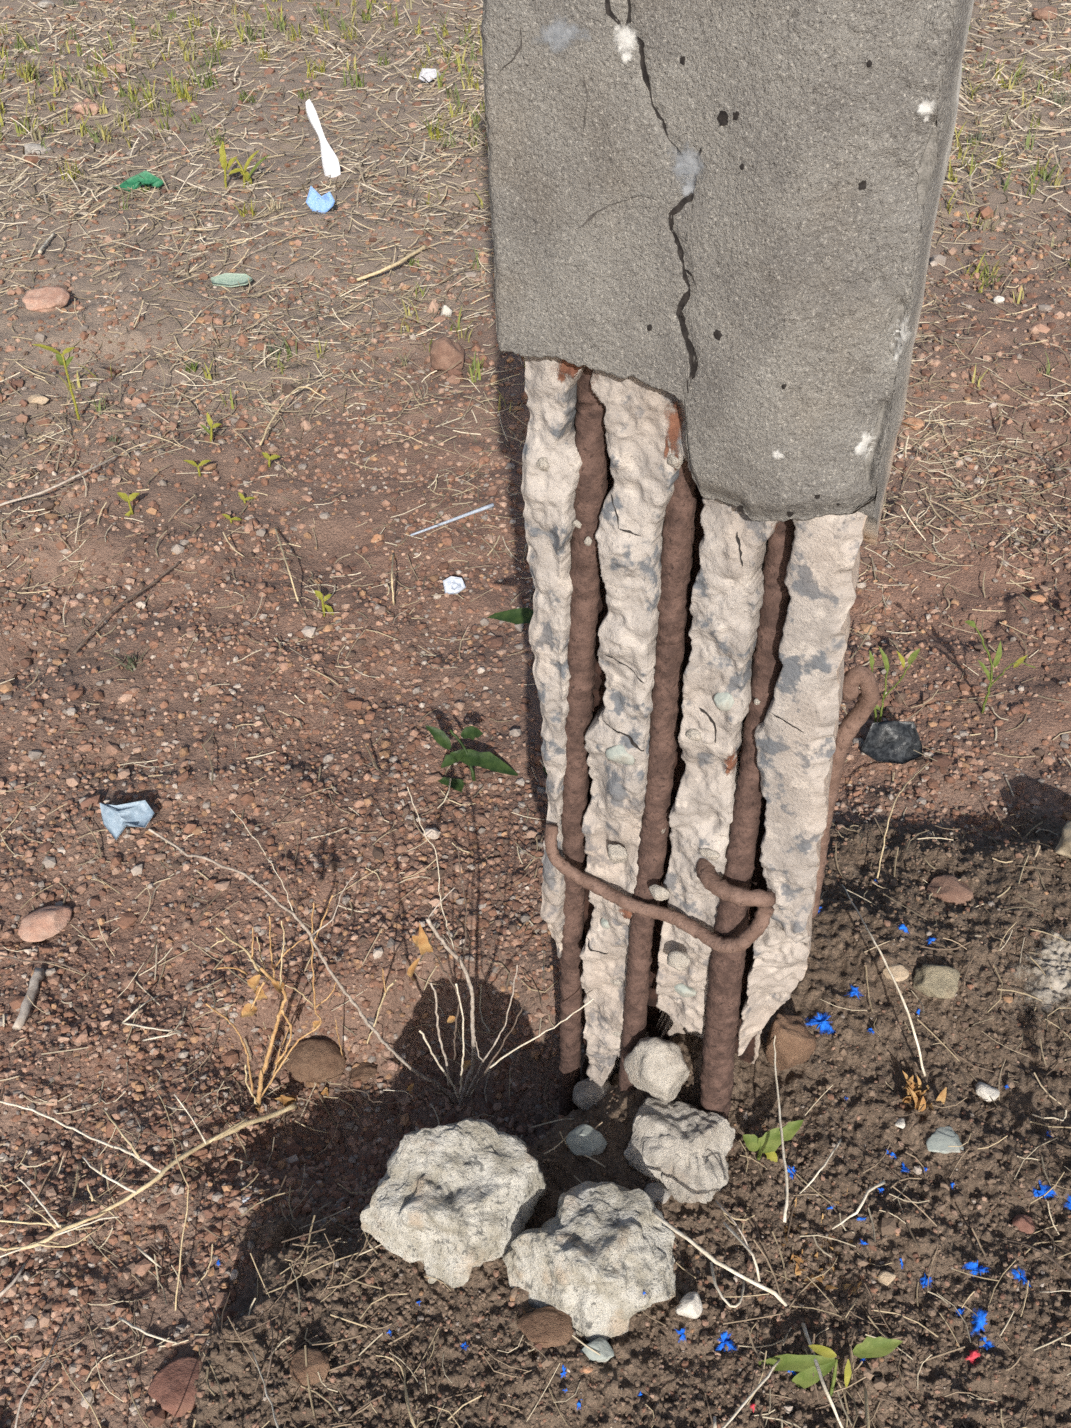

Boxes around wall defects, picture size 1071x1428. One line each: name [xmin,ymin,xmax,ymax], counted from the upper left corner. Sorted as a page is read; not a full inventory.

crack [576,0,702,398]
rust [558,359,592,390]
rust [664,403,683,470]
spalling [521,356,866,1087]
rust [725,742,743,775]